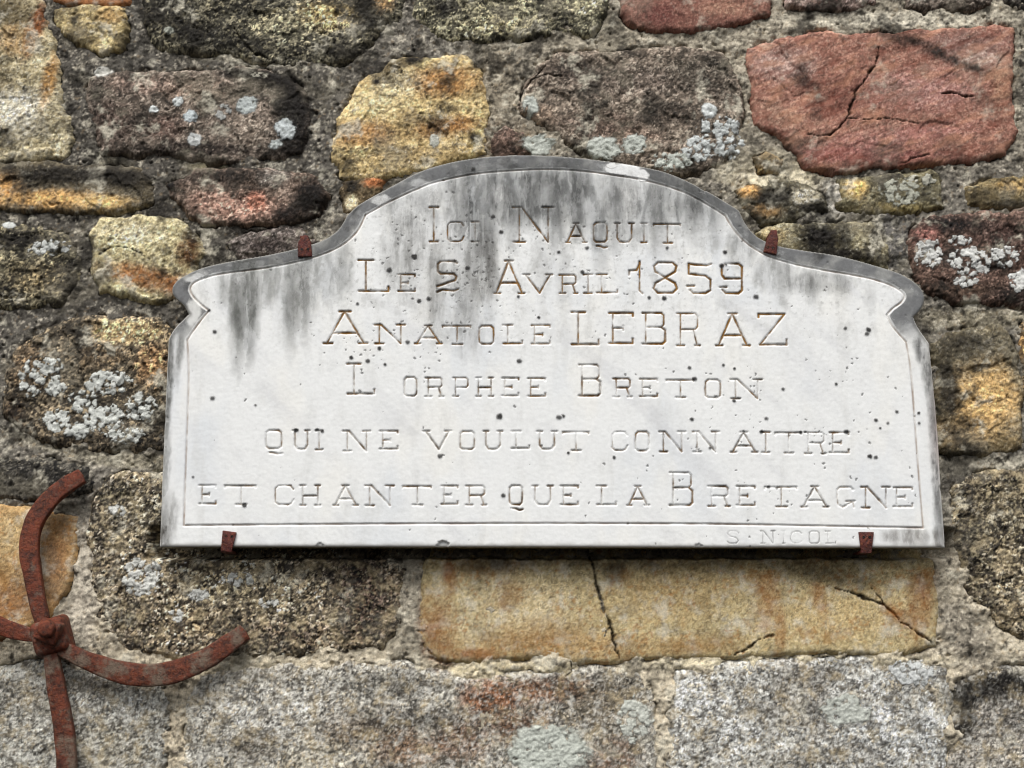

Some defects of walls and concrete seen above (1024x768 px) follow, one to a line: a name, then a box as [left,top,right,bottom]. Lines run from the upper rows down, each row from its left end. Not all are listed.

crack [817,56,899,137]
water stain [173,156,606,337]
water stain [644,168,924,328]
crack [589,557,618,654]
crack [850,588,930,641]